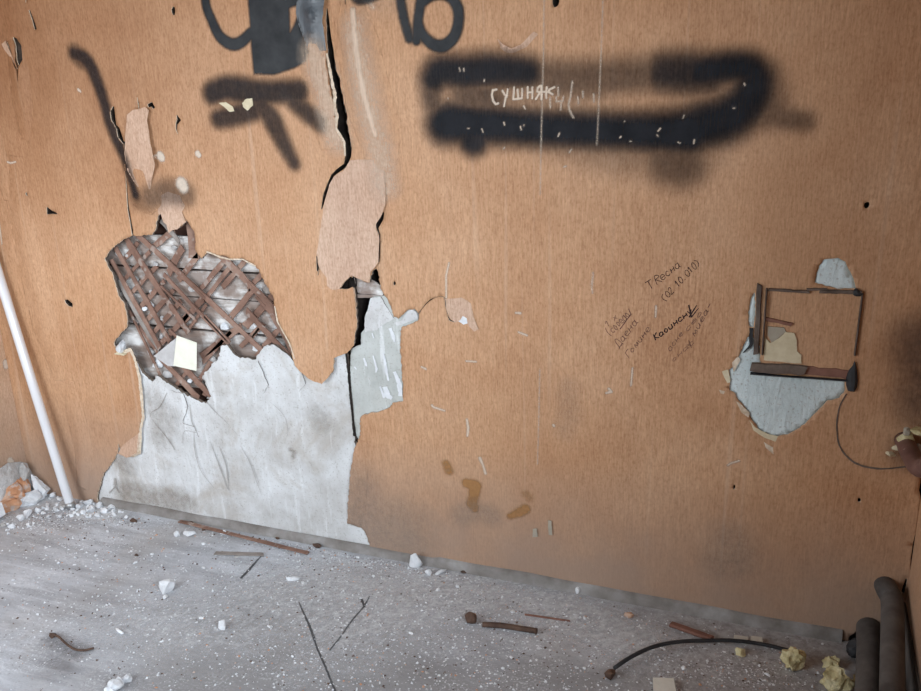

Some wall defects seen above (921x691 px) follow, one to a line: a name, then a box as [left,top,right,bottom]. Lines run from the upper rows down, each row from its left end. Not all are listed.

crack [321,0,352,209]
peeling [99,0,421,545]
crack [340,212,384,436]
peeling [719,292,845,454]
peeling [815,258,856,289]
spalling [0,462,50,513]